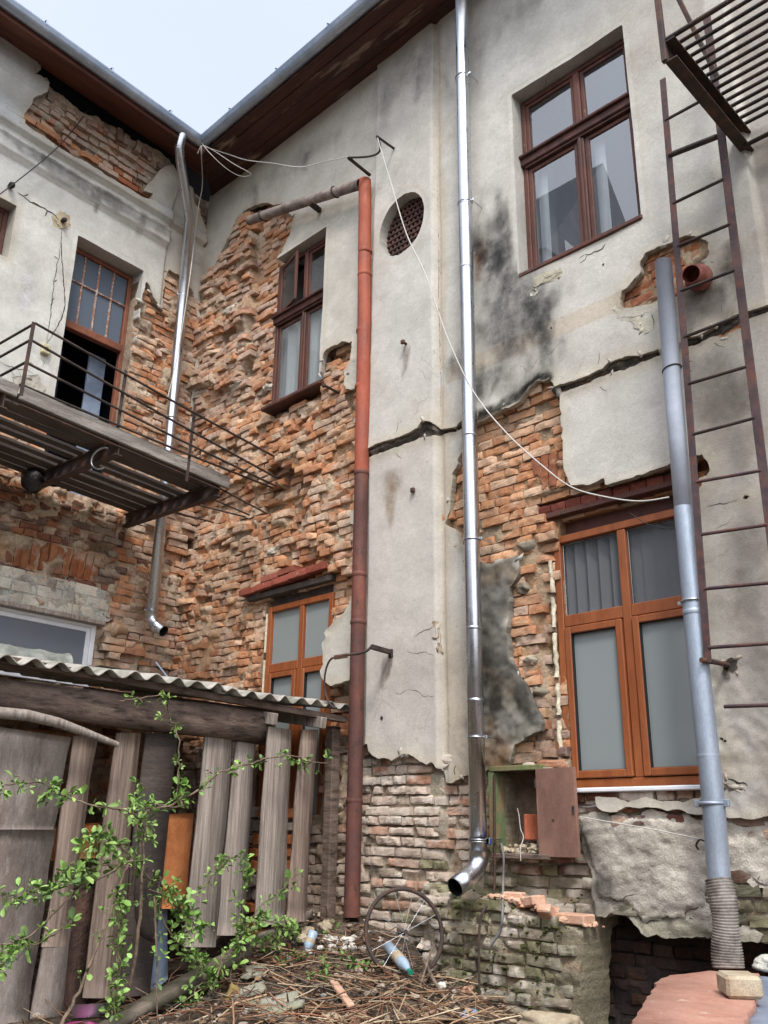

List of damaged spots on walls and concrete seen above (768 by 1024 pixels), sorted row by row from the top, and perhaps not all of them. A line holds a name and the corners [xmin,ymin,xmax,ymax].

spalling [19,64,177,199]
leakage [475,213,510,270]
crack [548,345,661,400]
spalling [613,231,714,335]
crack [688,308,768,347]
spalling [0,201,356,693]
crack [369,402,462,459]
spalling [360,382,703,1024]
spalling [0,719,160,814]
spalling [177,734,203,894]
spalling [726,817,768,840]
spalling [731,870,768,944]